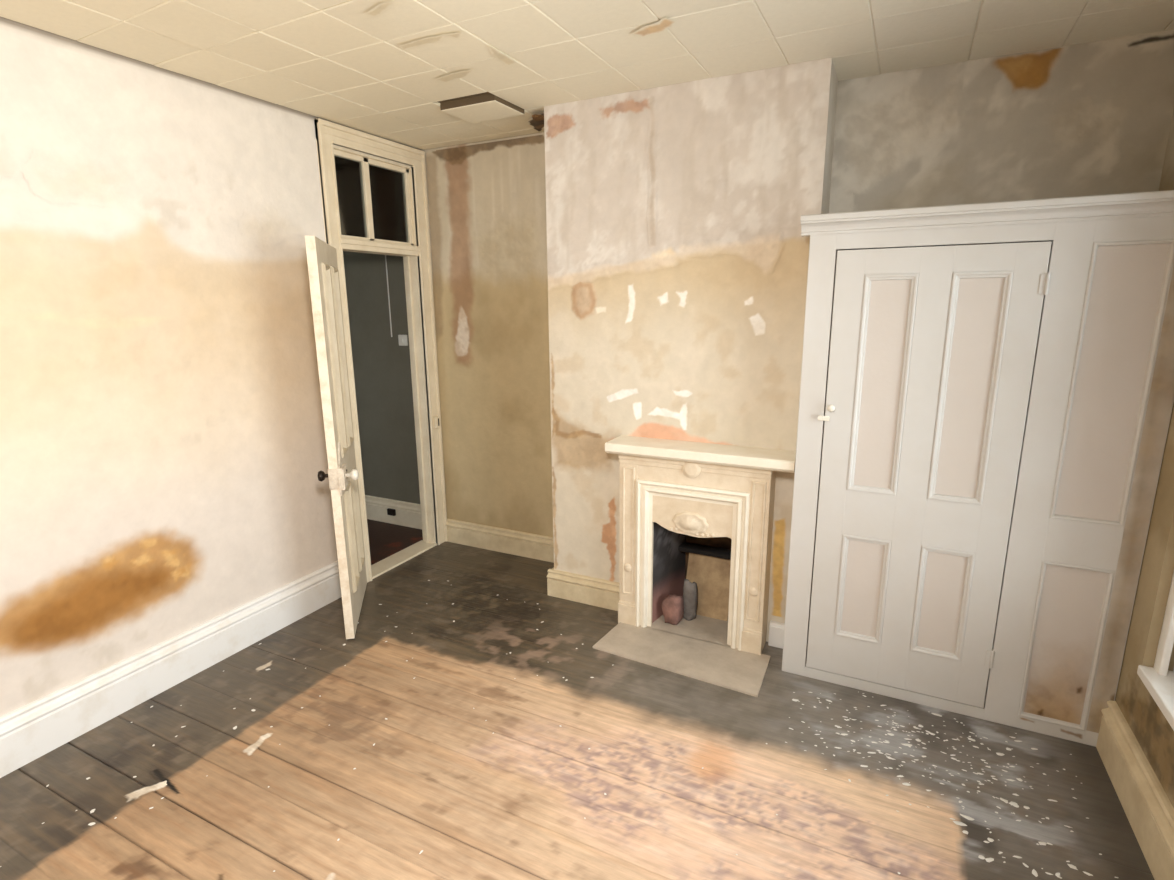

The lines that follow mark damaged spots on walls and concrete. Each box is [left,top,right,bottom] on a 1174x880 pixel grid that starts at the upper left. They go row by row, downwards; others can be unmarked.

peeling [632,18,676,37]
flaking render [597,94,652,122]
flaking render [532,111,578,141]
flaking render [605,387,740,446]
peeling [600,496,617,582]